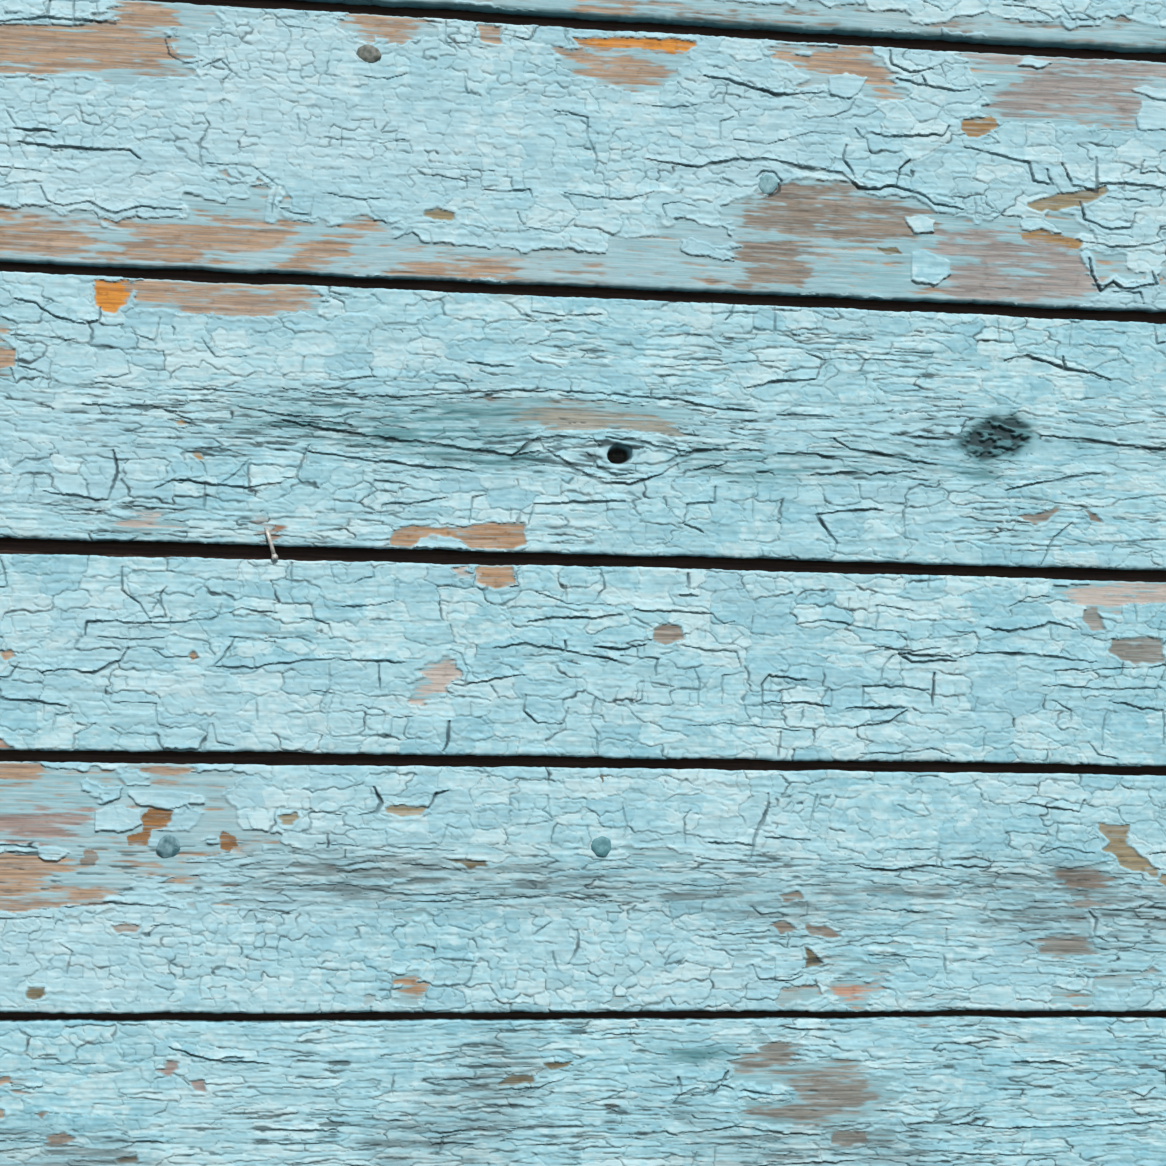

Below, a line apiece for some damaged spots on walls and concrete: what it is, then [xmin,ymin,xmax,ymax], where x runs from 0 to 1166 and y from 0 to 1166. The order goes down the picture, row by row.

peeling [905,215,935,234]
peeling [1018,180,1112,251]
peeling [877,245,951,286]